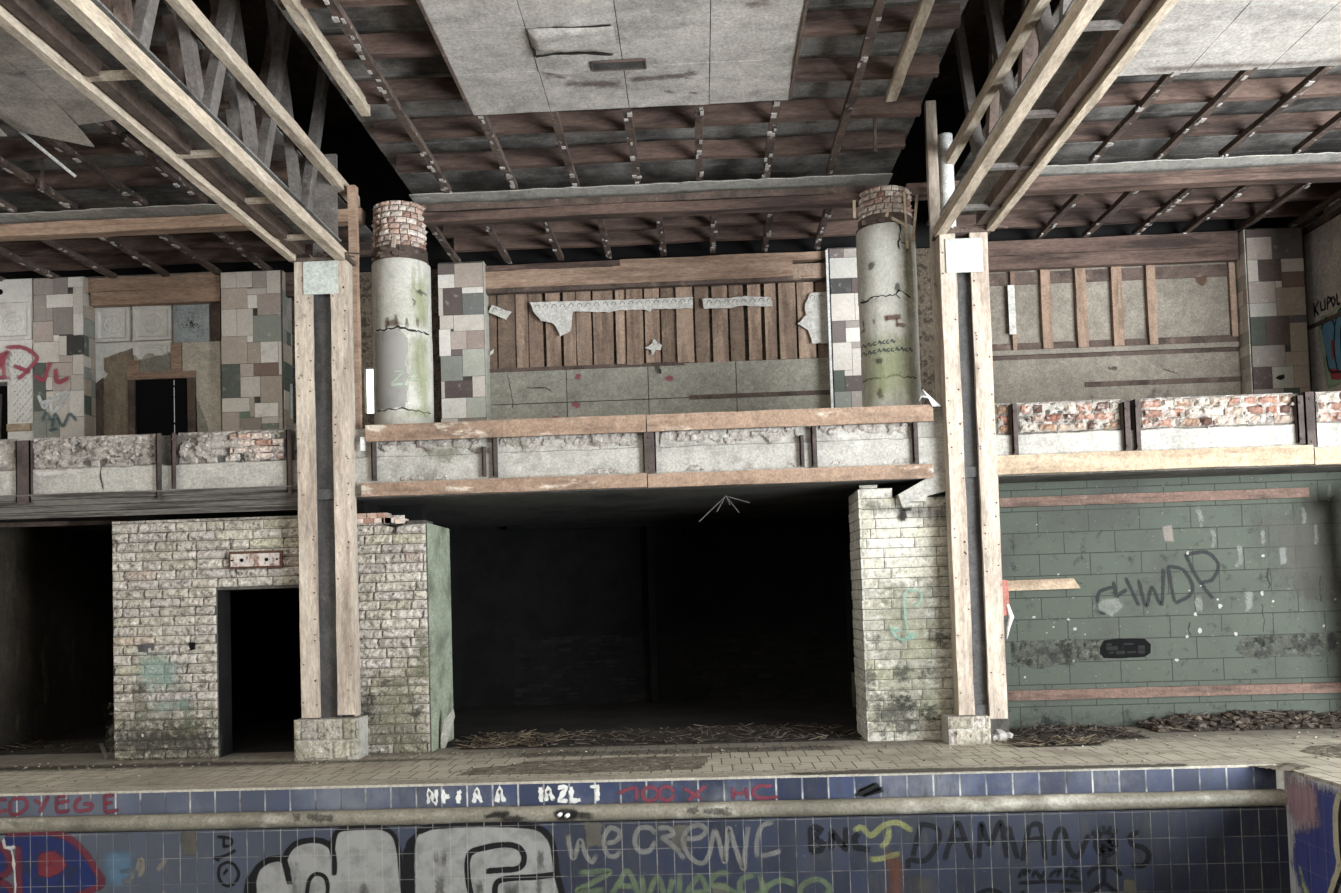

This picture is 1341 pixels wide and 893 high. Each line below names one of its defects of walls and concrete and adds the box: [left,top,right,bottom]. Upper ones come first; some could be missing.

crack [860,290,911,304]
damp [928,631,951,649]
damp [860,661,941,738]
damp [0,719,429,772]
damp [508,746,841,757]